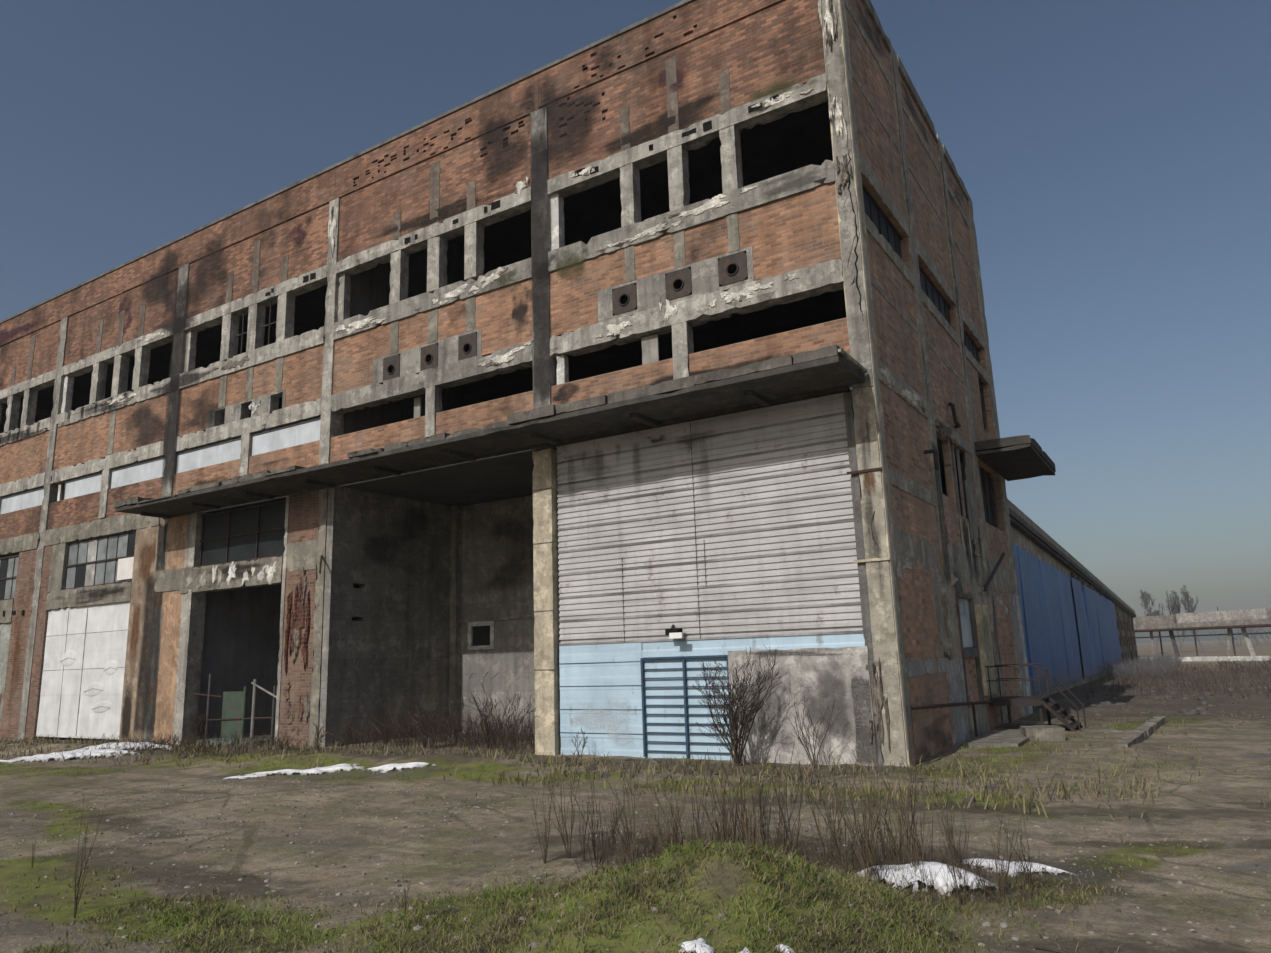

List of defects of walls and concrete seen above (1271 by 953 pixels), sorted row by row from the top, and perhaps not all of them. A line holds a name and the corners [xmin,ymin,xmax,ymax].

spalling [818,0,838,53]
leakage [658,70,683,90]
leakage [606,95,713,151]
spalling [607,186,758,247]
crack [844,151,863,317]
spalling [432,266,509,306]
spalling [659,299,678,320]
spalling [708,273,799,308]
leakage [807,674,877,764]